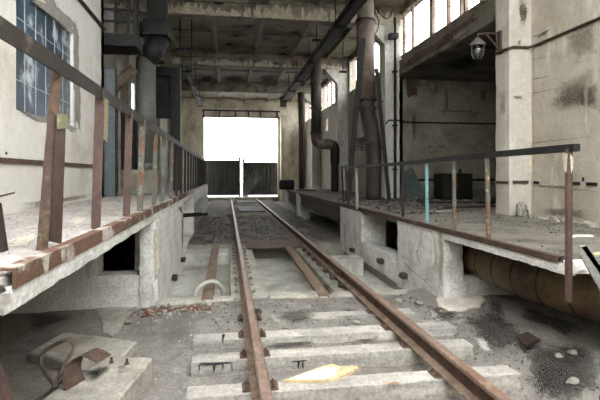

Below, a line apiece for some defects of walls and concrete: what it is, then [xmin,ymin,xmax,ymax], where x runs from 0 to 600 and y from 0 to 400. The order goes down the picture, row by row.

peeling [168,1,339,22]
peeling [374,10,393,25]
peeling [198,59,305,68]